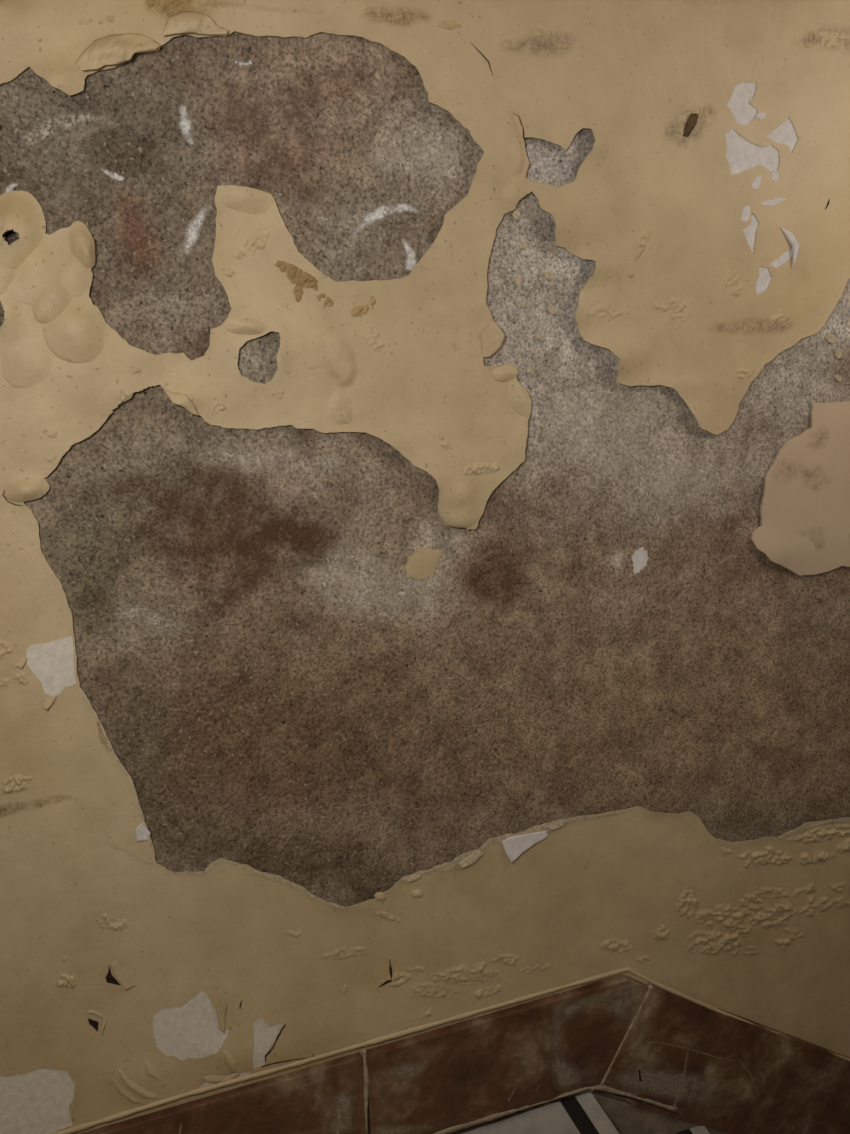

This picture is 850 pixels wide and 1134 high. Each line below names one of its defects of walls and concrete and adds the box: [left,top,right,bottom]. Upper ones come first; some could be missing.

peeling [683,113,699,137]
peeling [725,82,799,189]
spalling [0,5,483,360]
leakage [117,474,439,610]
spalling [0,128,850,908]
peeling [85,1010,107,1035]
peeling [152,990,230,1060]
peeling [198,1017,283,1092]
peeling [0,1068,75,1134]